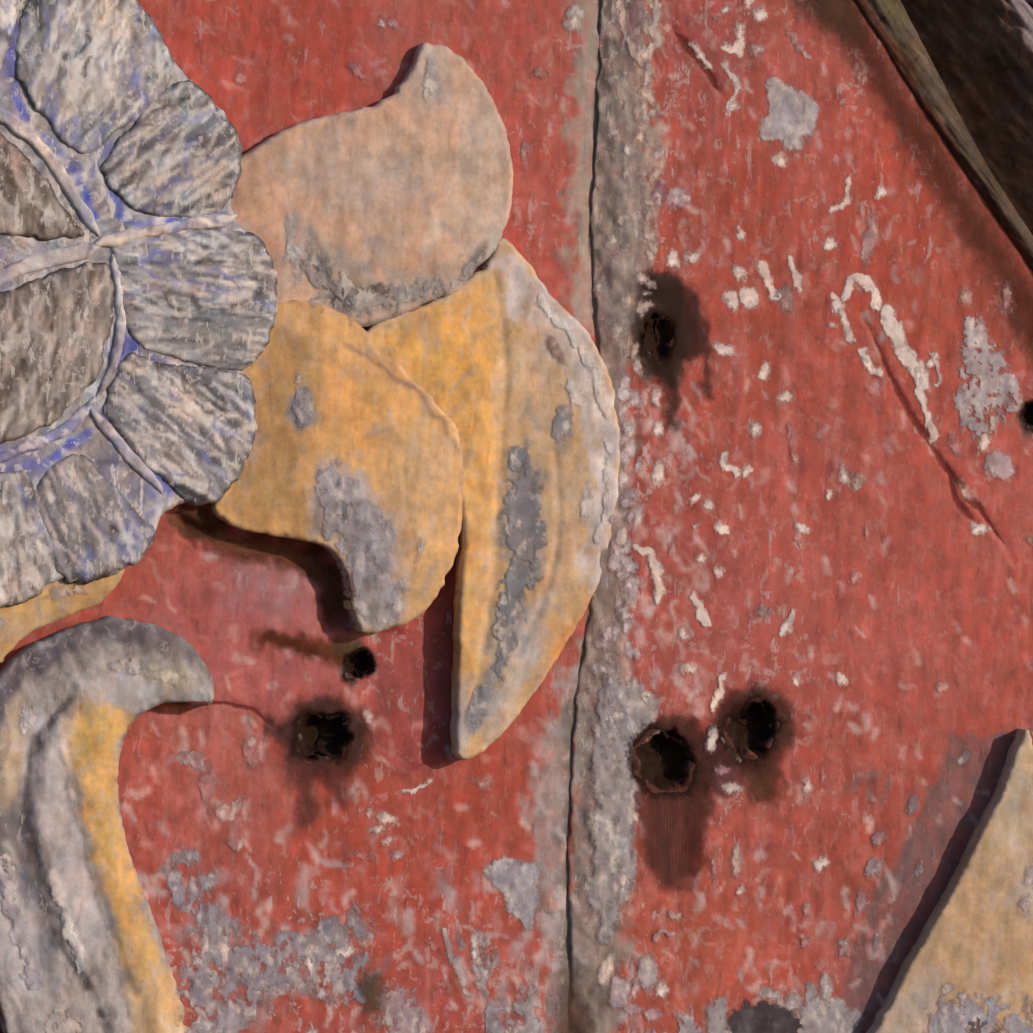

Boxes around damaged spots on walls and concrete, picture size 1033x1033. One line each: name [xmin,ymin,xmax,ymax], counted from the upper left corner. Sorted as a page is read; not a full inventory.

peeling [607,0,700,269]
peeling [759,76,819,167]
peeling [618,272,656,316]
peeling [722,255,803,315]
peeling [829,215,1023,480]
crack [874,338,1002,539]
peeling [316,458,407,628]
peeling [492,446,548,680]
peeling [536,293,869,1033]
peeling [160,847,431,1033]
peeling [442,928,550,1033]
peeling [485,856,542,931]